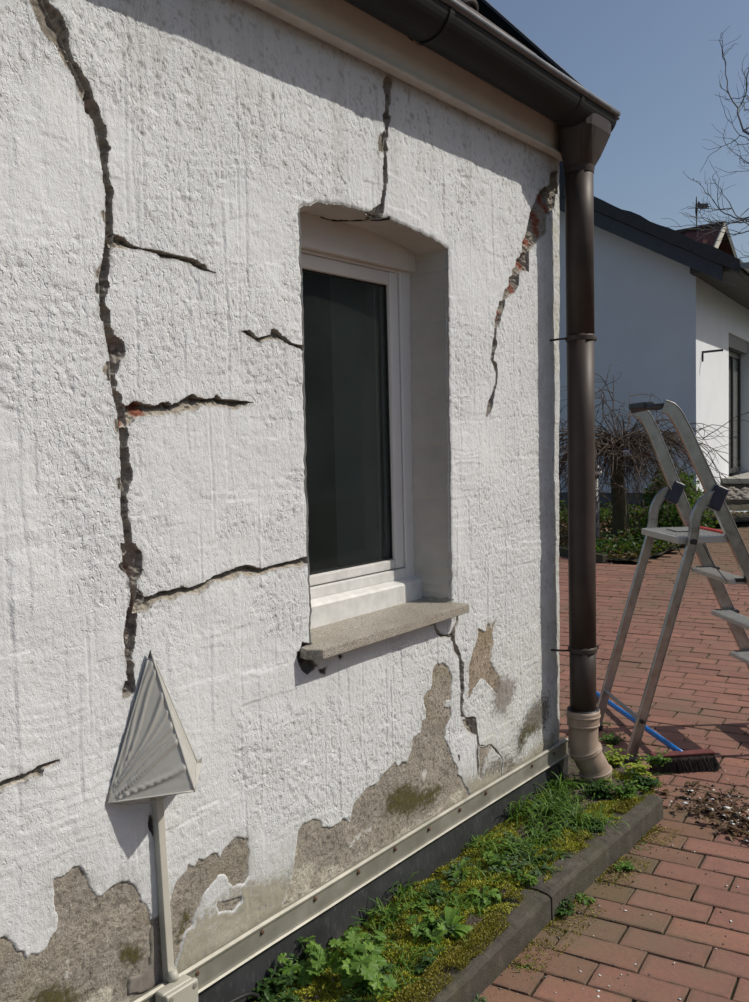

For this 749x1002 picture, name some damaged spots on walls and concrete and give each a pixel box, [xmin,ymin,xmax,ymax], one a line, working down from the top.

crack [320,75,392,222]
crack [29,0,308,699]
crack [486,170,558,417]
spalling [297,642,326,675]
peeling [468,622,500,698]
crack [0,759,60,791]
peeling [282,663,469,908]
peeling [478,747,490,778]
peeling [0,837,249,1002]